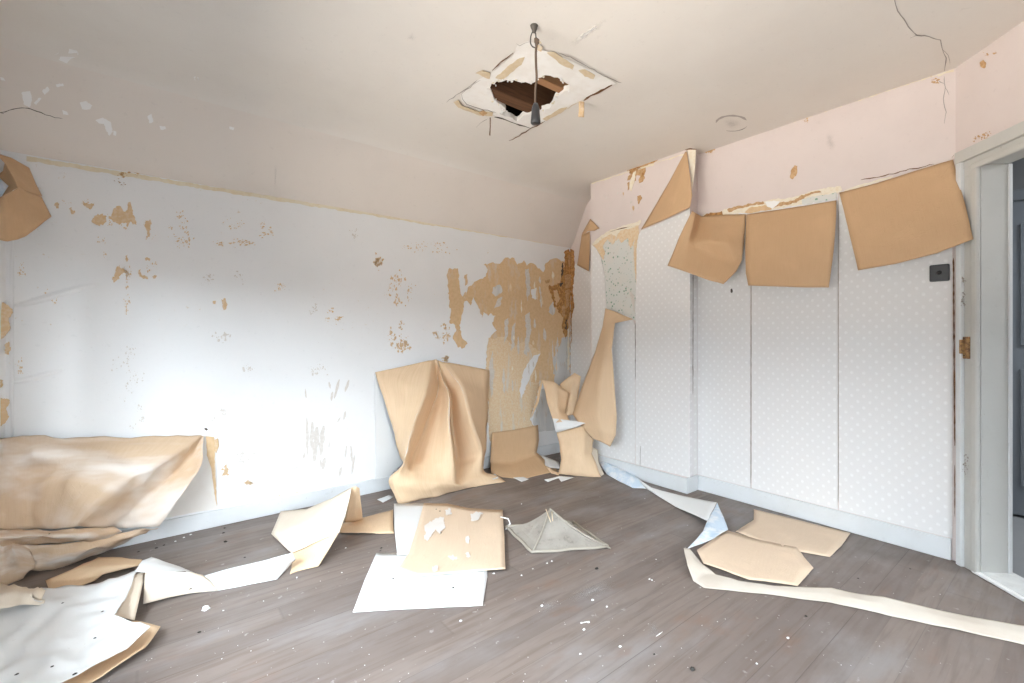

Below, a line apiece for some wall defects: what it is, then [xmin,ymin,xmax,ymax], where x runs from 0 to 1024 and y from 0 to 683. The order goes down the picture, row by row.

spalling [447,41,621,141]
crack [894,0,950,123]
peeling [54,199,156,255]
peeling [623,160,657,211]
peeling [112,255,157,315]
peeling [432,257,571,441]
peeling [568,308,632,446]